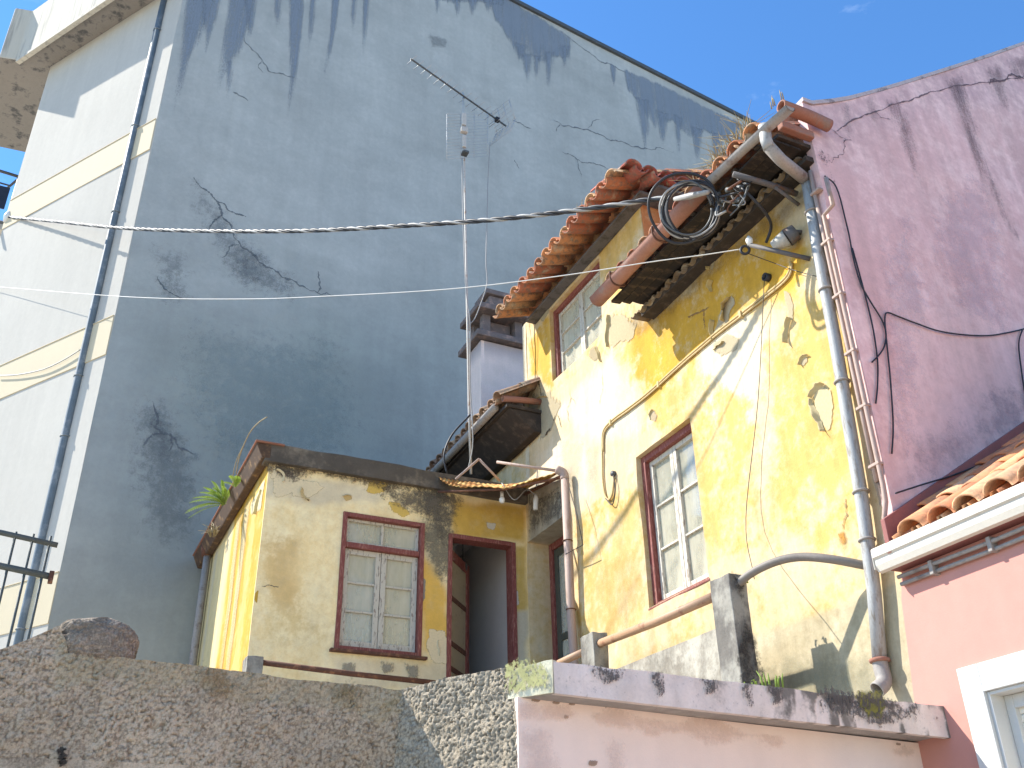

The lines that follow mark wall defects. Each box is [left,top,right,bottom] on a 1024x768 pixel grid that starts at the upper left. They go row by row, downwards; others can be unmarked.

damp [452,0,570,77]
crack [556,119,667,175]
damp [611,65,741,155]
crack [831,73,1024,163]
crack [194,178,332,296]
peeling [589,313,636,362]
peeling [708,296,739,356]
peeling [782,291,793,343]
crack [143,401,193,454]
peeling [807,382,833,432]
damp [266,463,461,540]
damp [652,672,665,696]